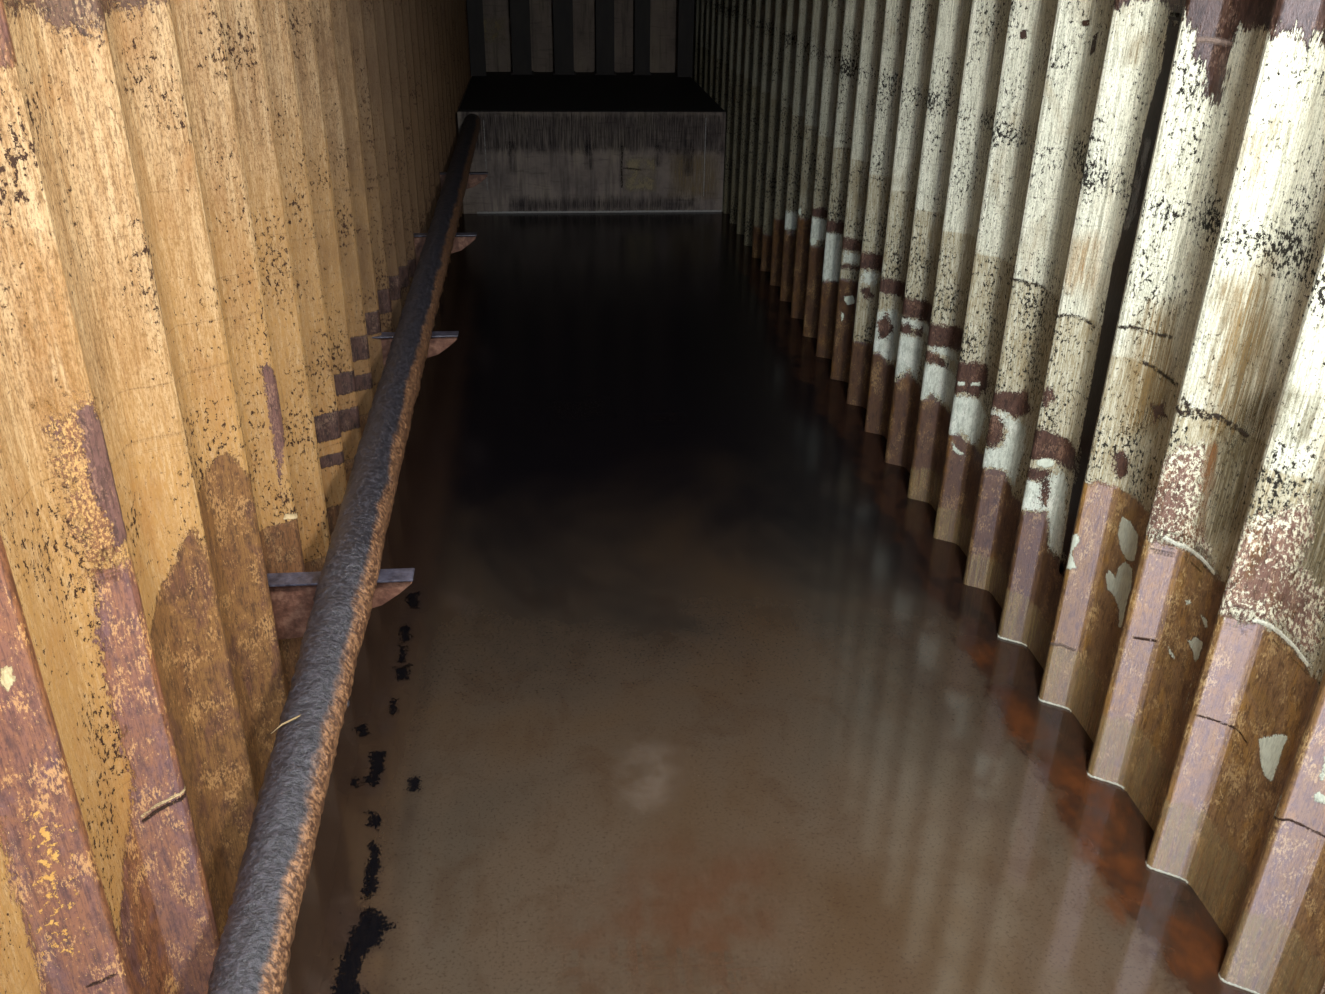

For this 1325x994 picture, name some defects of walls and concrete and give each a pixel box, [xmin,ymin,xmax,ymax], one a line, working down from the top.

corrosion [0,0,171,69]
peeling [752,208,1325,994]
corrosion [1308,488,1325,601]
crack [1273,816,1325,837]